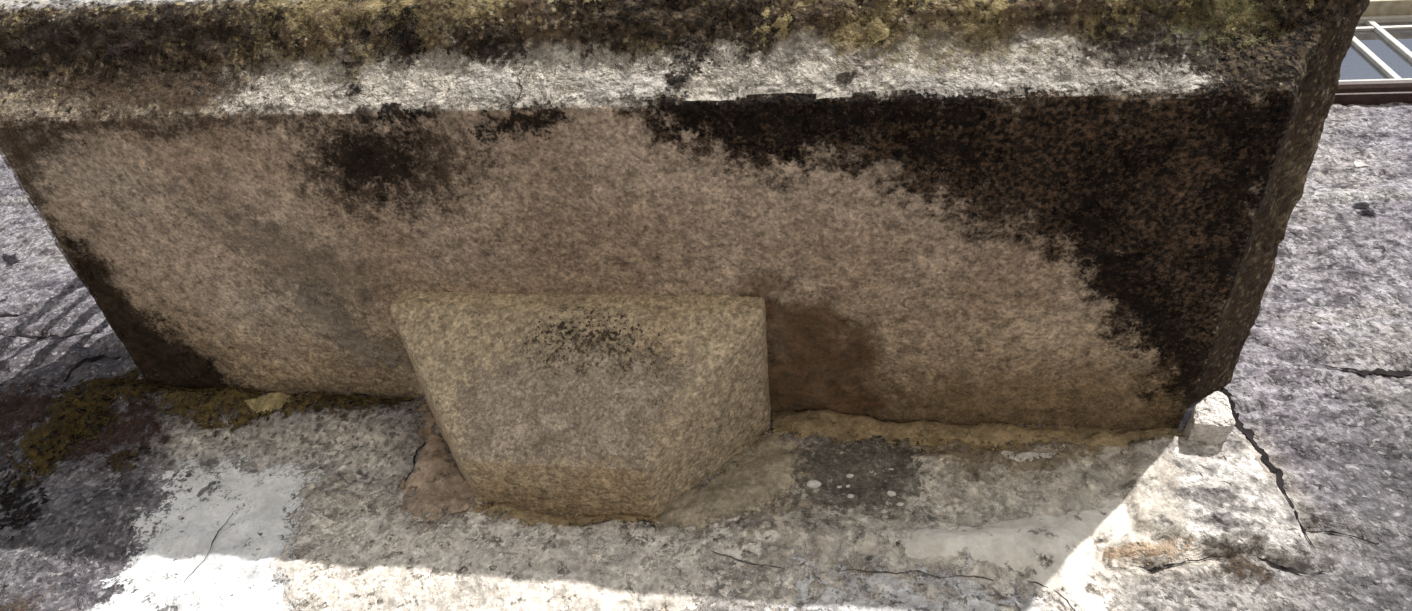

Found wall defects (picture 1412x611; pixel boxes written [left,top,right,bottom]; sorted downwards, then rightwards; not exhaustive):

leakage [445,16,527,72]
leakage [0,0,504,392]
leakage [558,0,1369,424]
leakage [522,303,690,405]
crack [1325,365,1412,377]
crack [1221,387,1379,575]
crack [1104,556,1223,572]